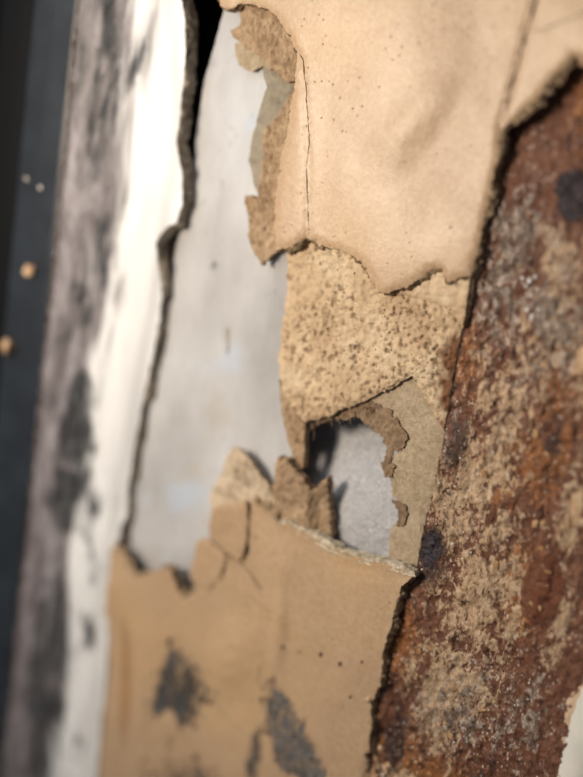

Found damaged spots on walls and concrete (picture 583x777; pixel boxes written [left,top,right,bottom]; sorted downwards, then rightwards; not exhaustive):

crack [300,55,310,200]
crack [502,0,582,123]
spalling [190,5,475,589]
corrosion [365,59,583,777]
damp [141,634,217,730]
damp [247,678,326,777]